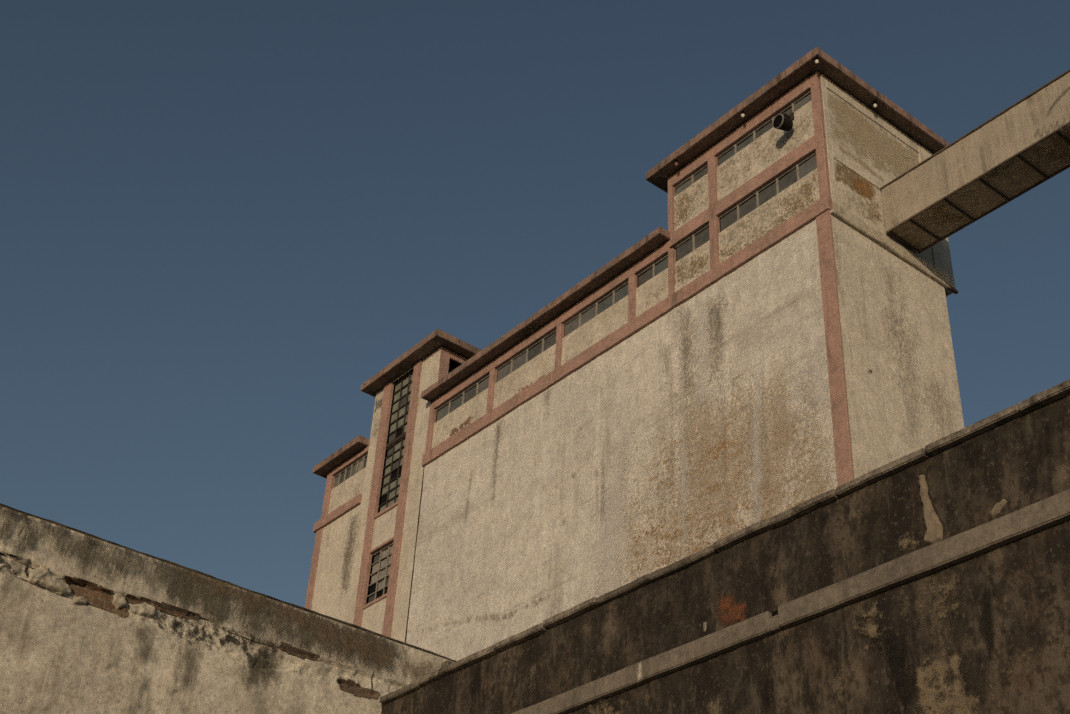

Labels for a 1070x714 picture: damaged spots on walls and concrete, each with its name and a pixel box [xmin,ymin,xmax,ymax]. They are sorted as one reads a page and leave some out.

corrosion [835,164,874,200]
flaking render [918,475,945,545]
crack [0,552,115,599]
leakage [0,505,440,691]
leakage [975,585,995,656]